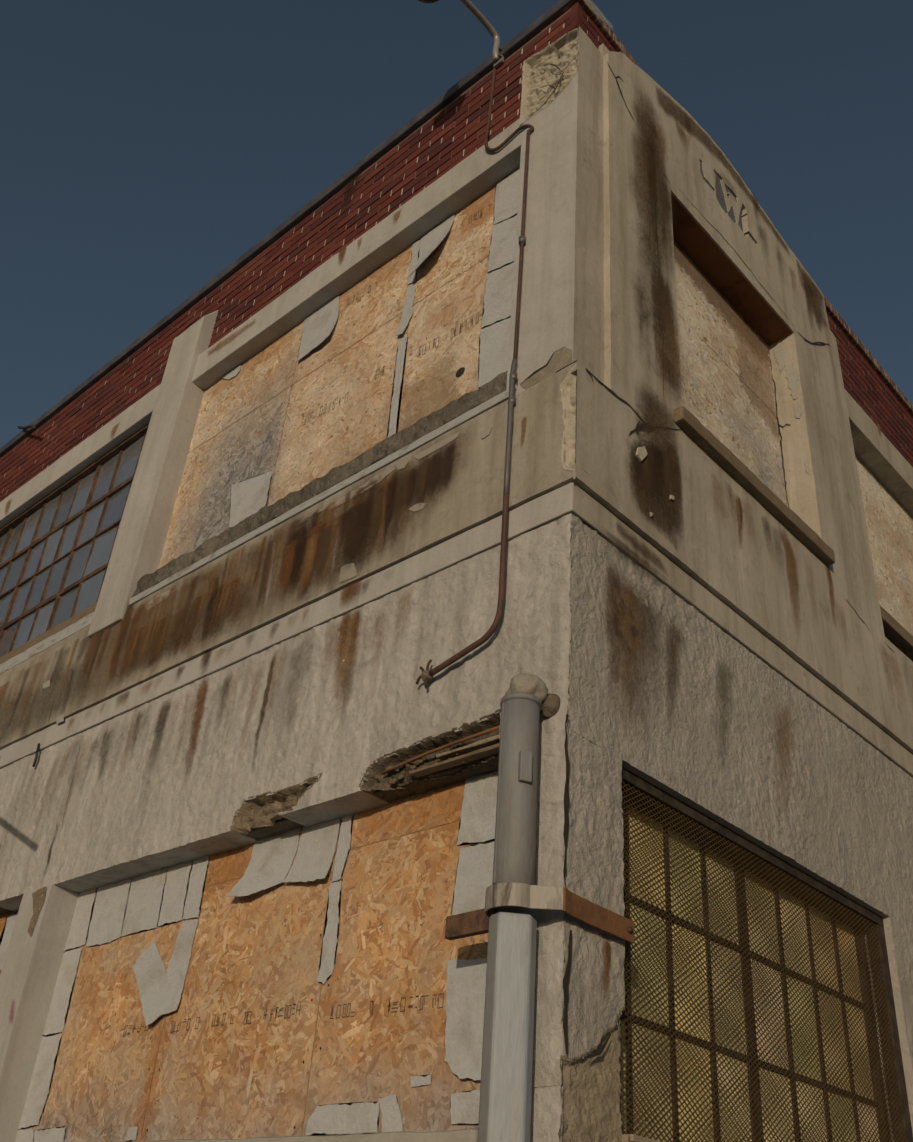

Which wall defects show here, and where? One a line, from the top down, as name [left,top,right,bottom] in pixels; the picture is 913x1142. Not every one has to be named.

spalling [519,28,579,126]
damp [637,91,787,377]
crack [522,347,564,383]
crack [585,368,680,436]
damp [630,394,681,536]
damp [615,526,662,570]
rust [337,612,359,687]
rust [190,682,207,750]
rust [256,660,274,741]
spalling [359,708,501,792]
spalling [230,773,322,834]
flaking render [558,1005,625,1142]